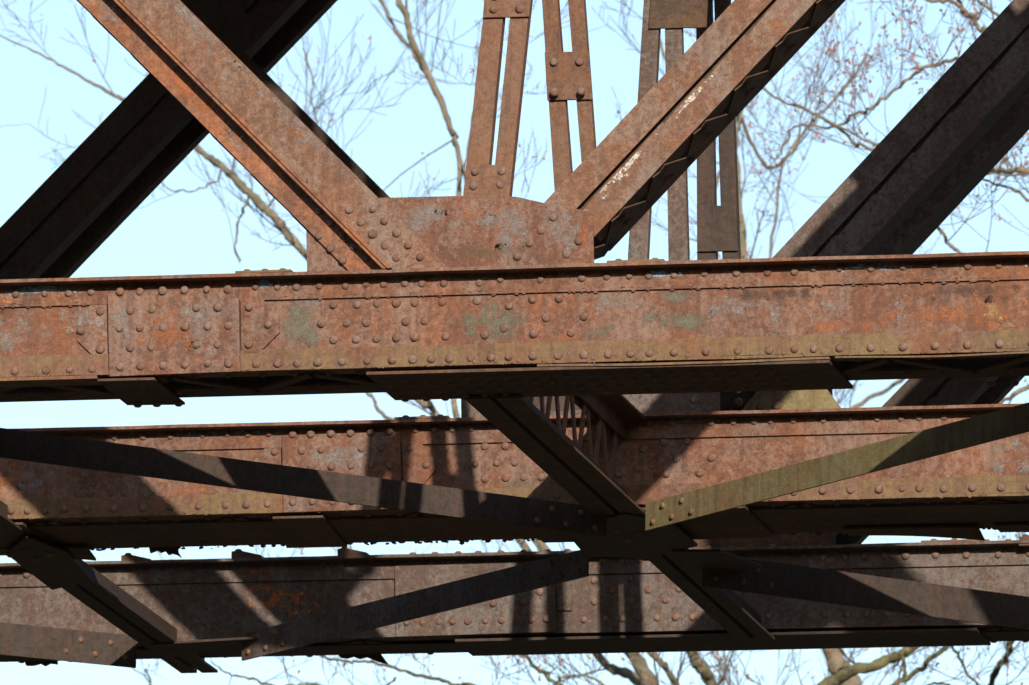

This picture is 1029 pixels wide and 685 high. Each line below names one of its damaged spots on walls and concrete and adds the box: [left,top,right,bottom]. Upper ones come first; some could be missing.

rust [169,70,211,111]
peeling [600,151,641,198]